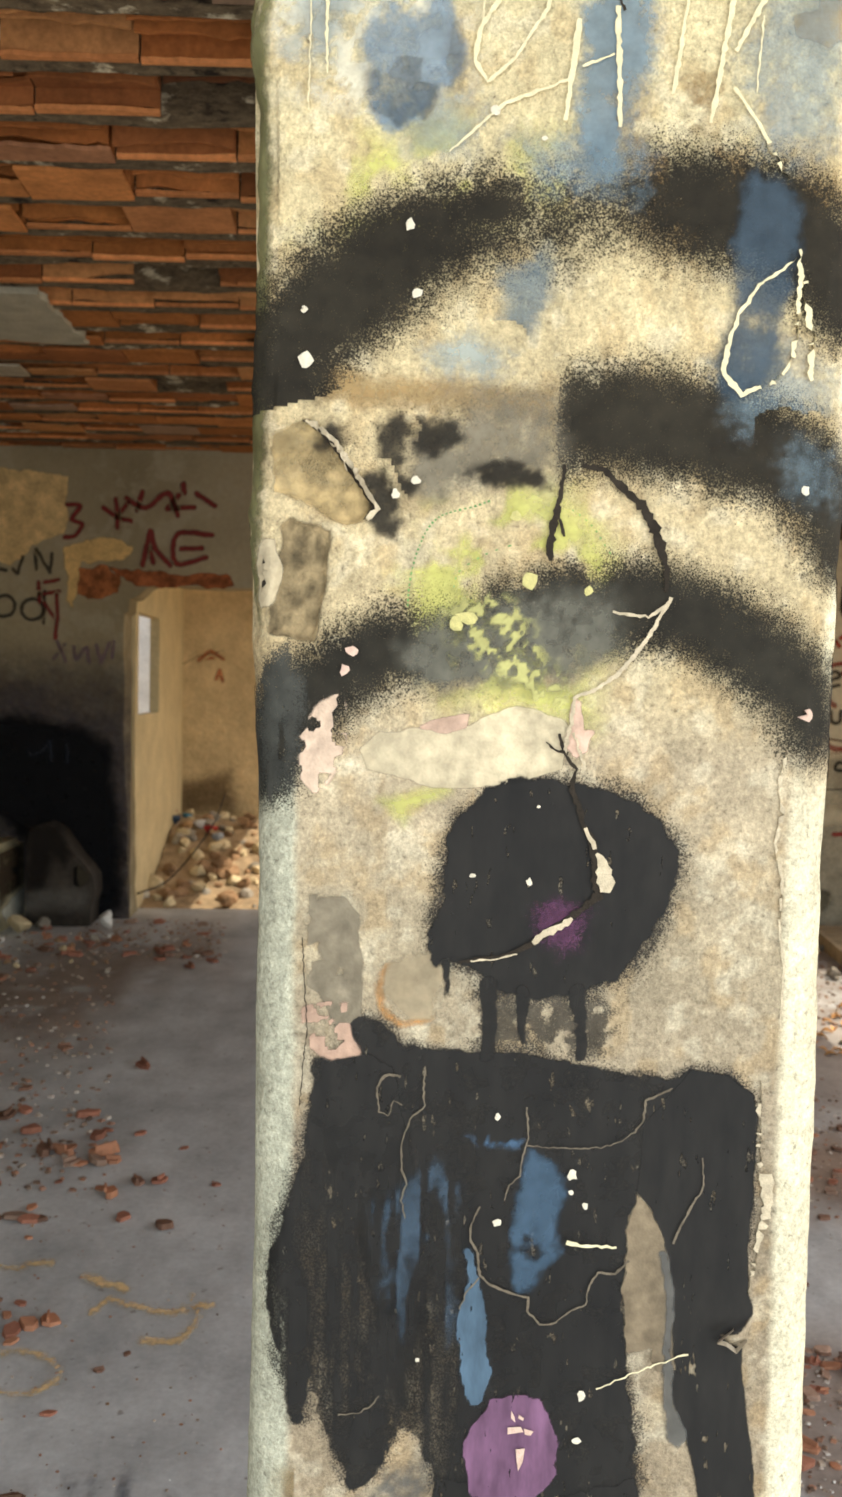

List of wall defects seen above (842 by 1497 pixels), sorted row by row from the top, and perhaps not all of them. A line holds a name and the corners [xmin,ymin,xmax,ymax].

flaking render [0,286,89,345]
flaking render [0,467,235,608]
peeling [798,709,813,722]